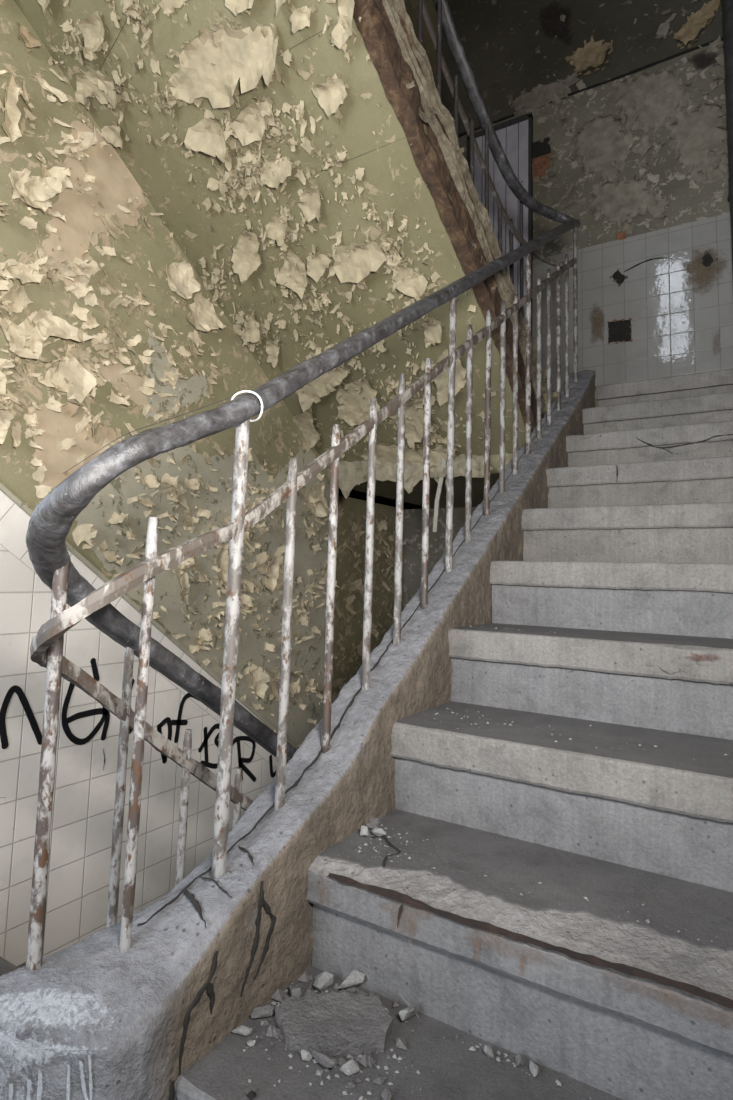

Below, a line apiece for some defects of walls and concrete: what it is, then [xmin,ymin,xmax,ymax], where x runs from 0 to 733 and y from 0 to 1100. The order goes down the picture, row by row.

peeling [0,0,441,498]
flaking render [382,0,546,414]
leakage [687,253,721,289]
peeling [72,441,234,579]
peeling [236,308,509,748]
peeling [127,540,229,680]
rust [328,873,733,1009]